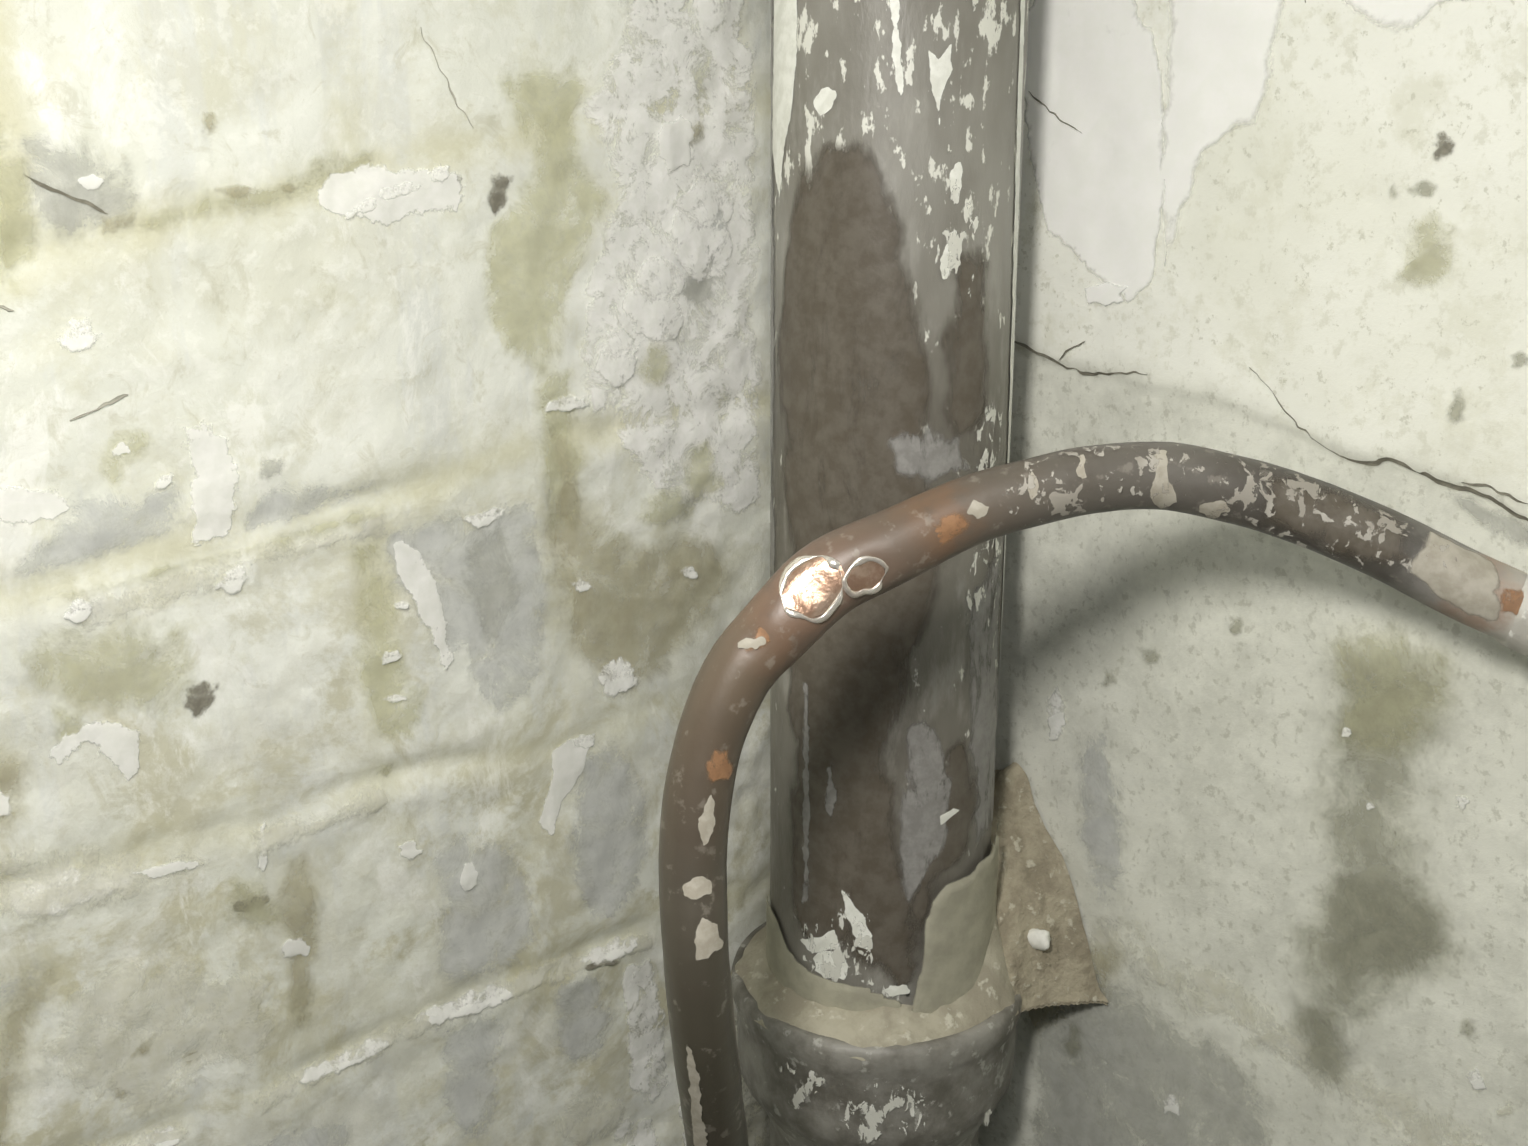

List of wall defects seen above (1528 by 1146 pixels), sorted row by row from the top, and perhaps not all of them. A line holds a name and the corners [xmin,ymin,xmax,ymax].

peeling [546,0,761,520]
crack [1014,341,1147,376]
crack [1249,367,1528,542]
water stain [0,764,17,816]
peeling [50,721,140,780]
spalling [185,681,217,716]
water stain [364,589,413,730]
peeling [388,507,544,708]
peeling [539,734,595,835]
water stain [547,386,722,696]
water stain [1305,648,1439,1079]
water stain [240,871,313,1006]